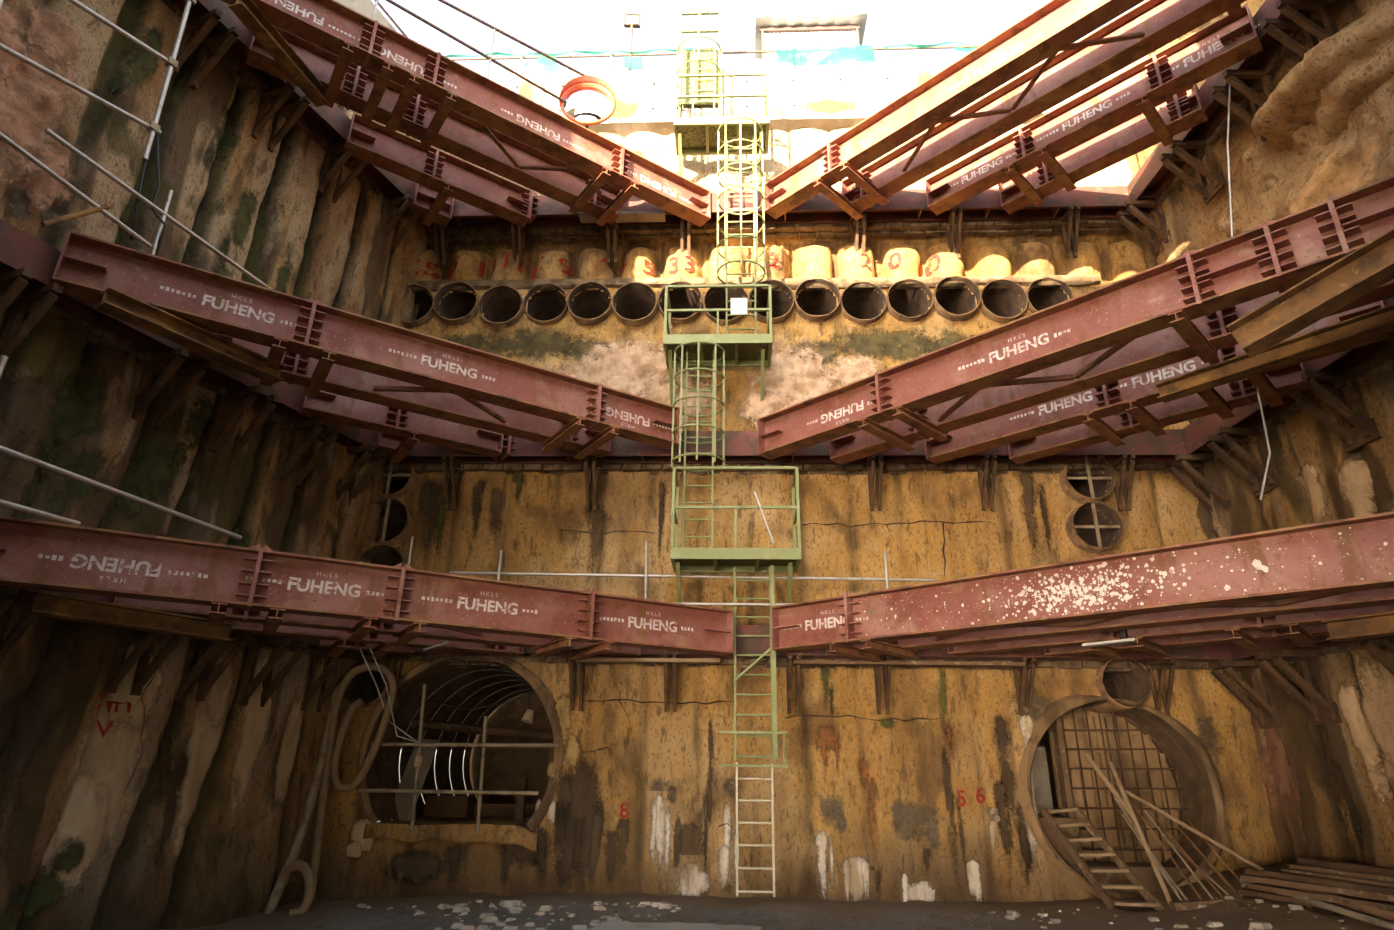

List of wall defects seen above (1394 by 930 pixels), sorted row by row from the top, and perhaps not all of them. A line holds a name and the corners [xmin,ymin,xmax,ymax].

leakage [419,479,446,555]
leakage [472,480,506,537]
leakage [585,501,608,566]
leakage [658,483,666,553]
leakage [500,756,630,886]
leakage [650,720,739,896]
leakage [816,798,880,901]
leakage [892,724,982,902]
leakage [989,688,1046,884]
leakage [1197,717,1223,756]